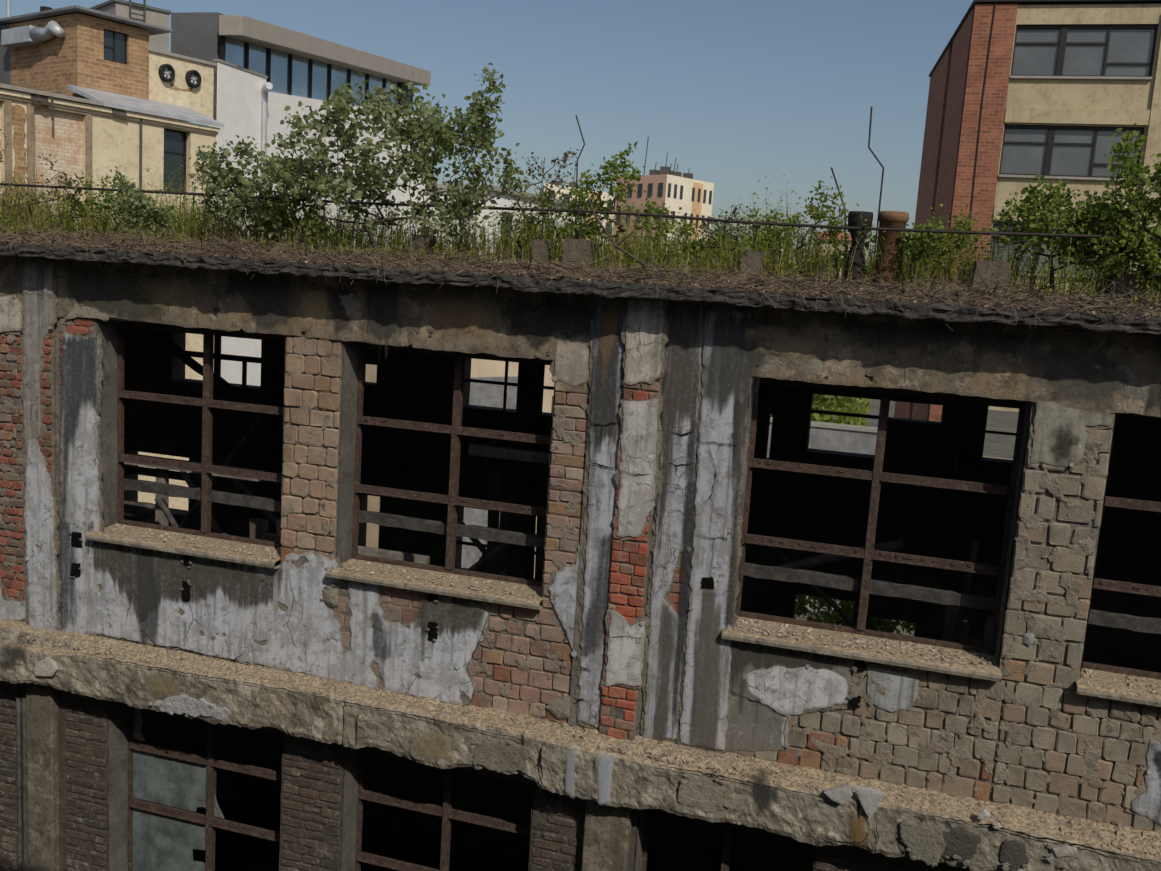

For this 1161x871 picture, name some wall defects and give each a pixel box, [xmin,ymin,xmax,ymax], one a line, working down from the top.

leakage [67,266,162,318]
leakage [1036,347,1128,404]
leakage [58,335,97,627]
peeling [0,260,490,705]
crack [590,422,736,568]
peeling [536,299,920,754]
leakage [652,308,844,749]
leakage [88,541,282,644]
peeling [824,784,884,818]
spalling [900,820,981,868]
spalling [992,822,1029,871]
peeling [1125,739,1161,825]